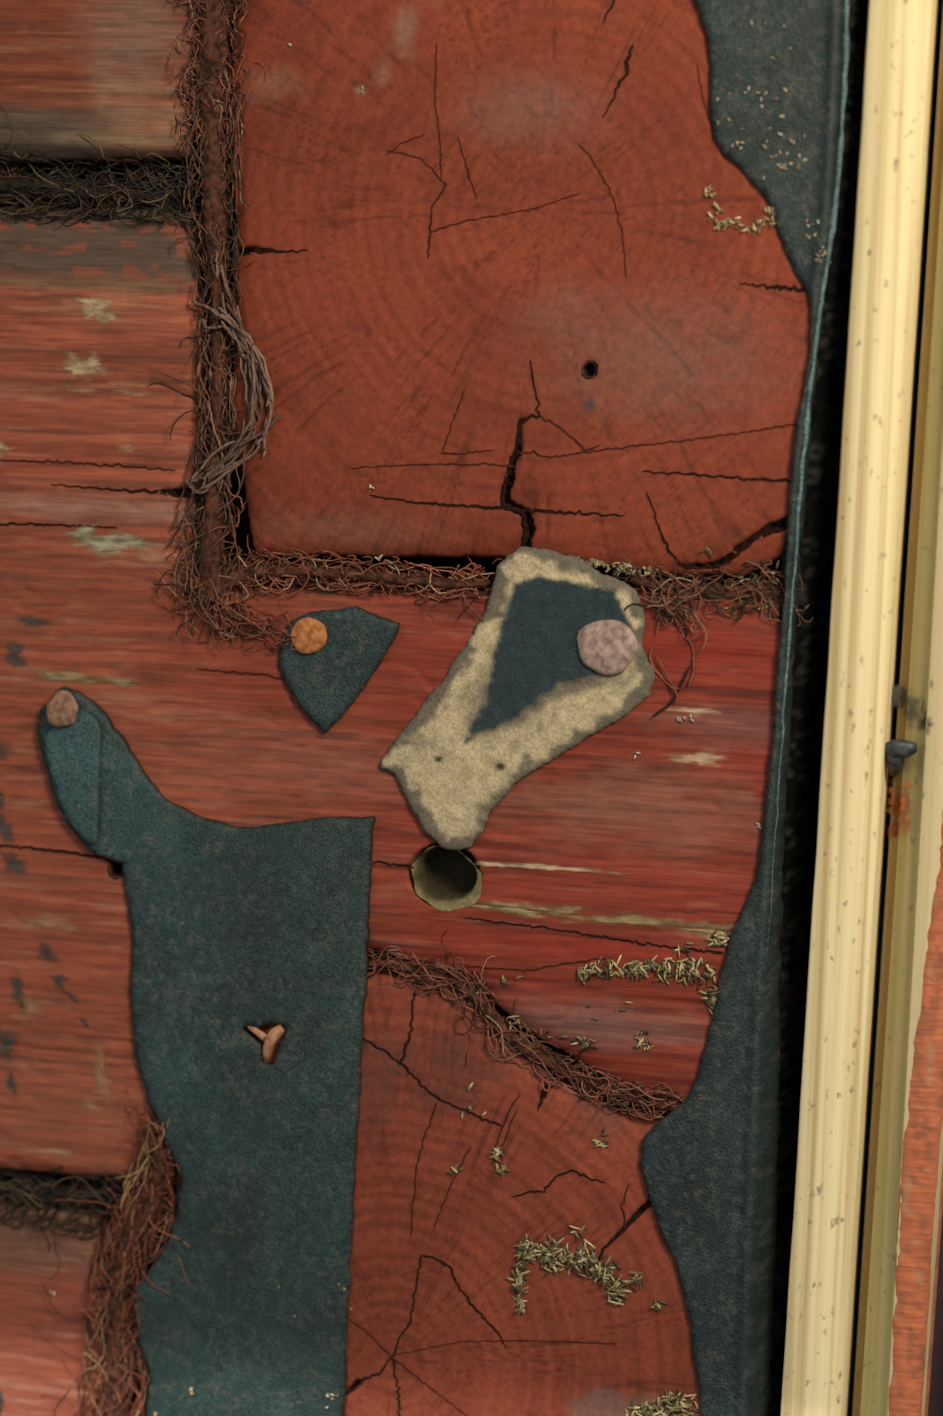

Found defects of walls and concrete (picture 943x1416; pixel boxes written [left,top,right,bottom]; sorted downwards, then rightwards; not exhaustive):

crack [350,361,797,584]